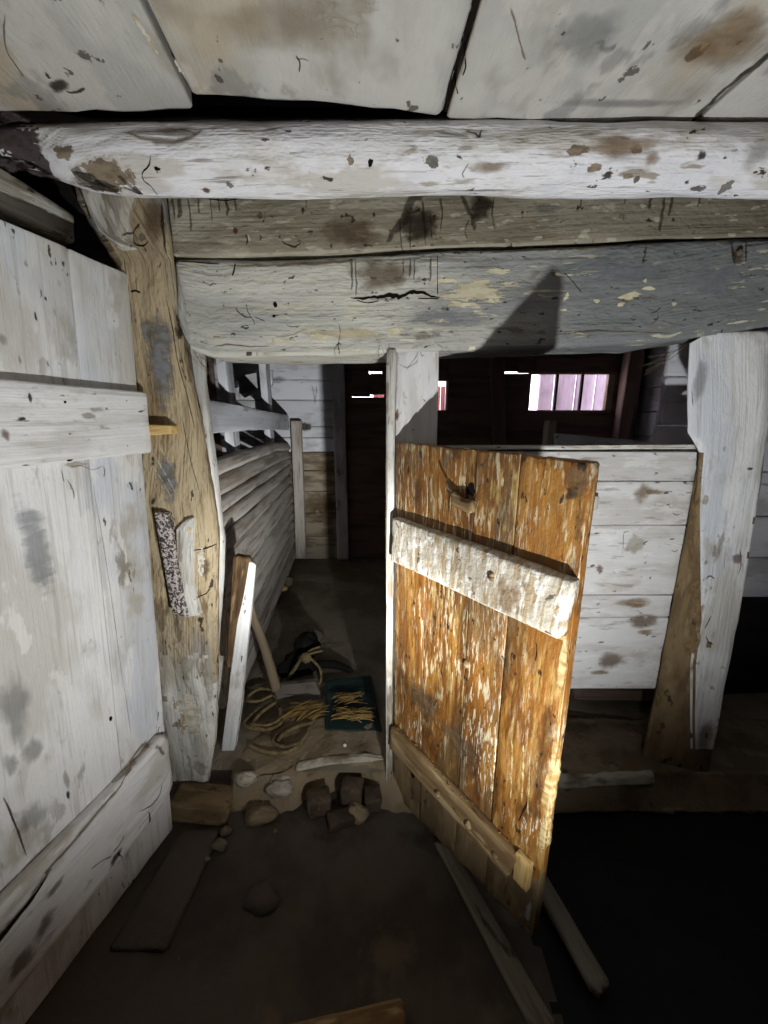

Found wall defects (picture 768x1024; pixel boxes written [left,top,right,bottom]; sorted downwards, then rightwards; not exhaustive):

crack [351,255,440,303]
peeling [433,268,510,307]
peeling [567,462,588,499]
peeling [556,636,568,693]
peeling [539,741,560,849]